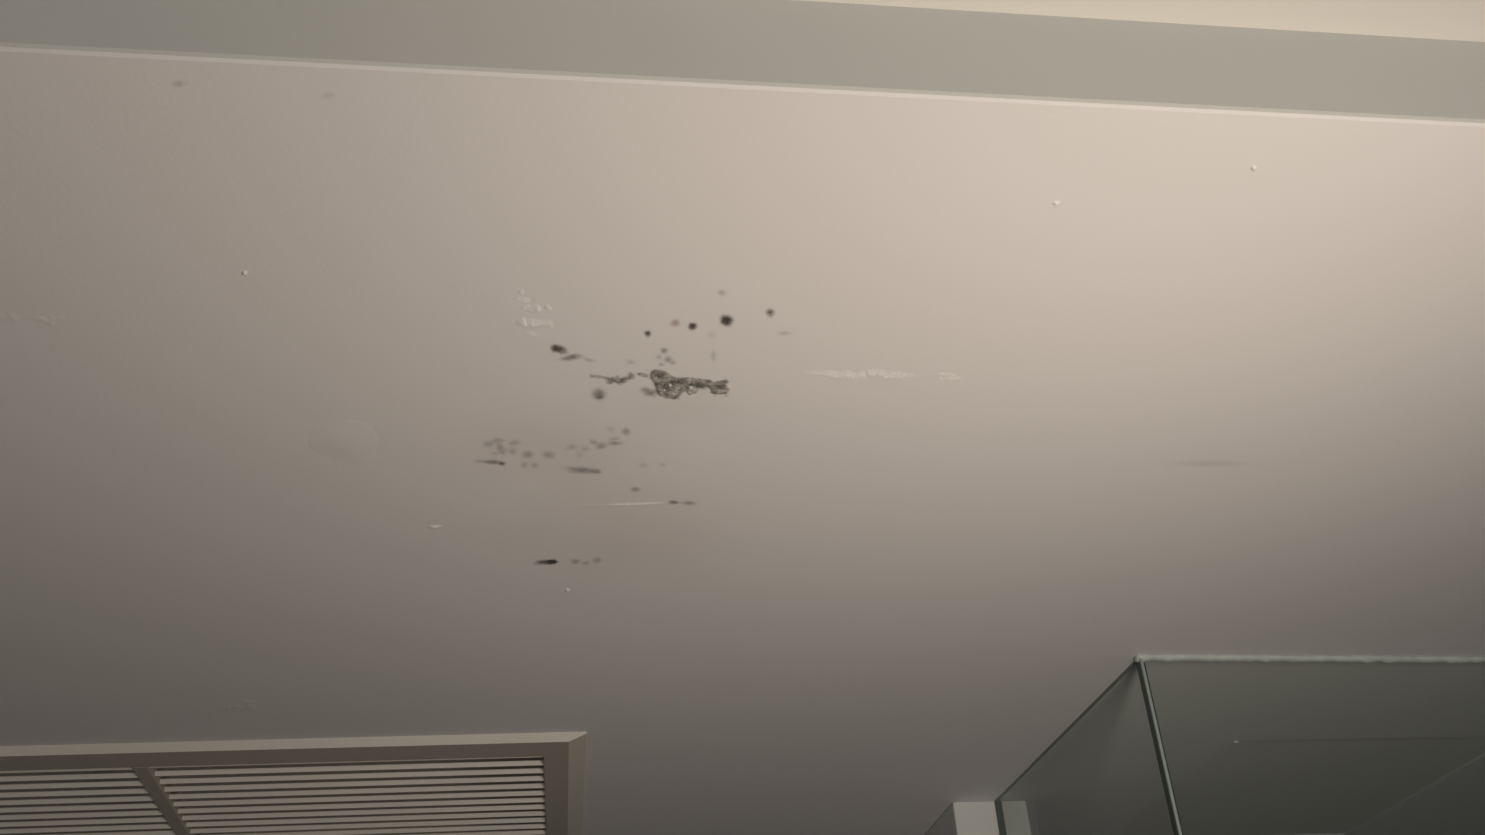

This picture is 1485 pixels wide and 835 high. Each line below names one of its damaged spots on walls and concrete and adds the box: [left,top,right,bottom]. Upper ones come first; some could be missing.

flaking render [592,370,729,399]